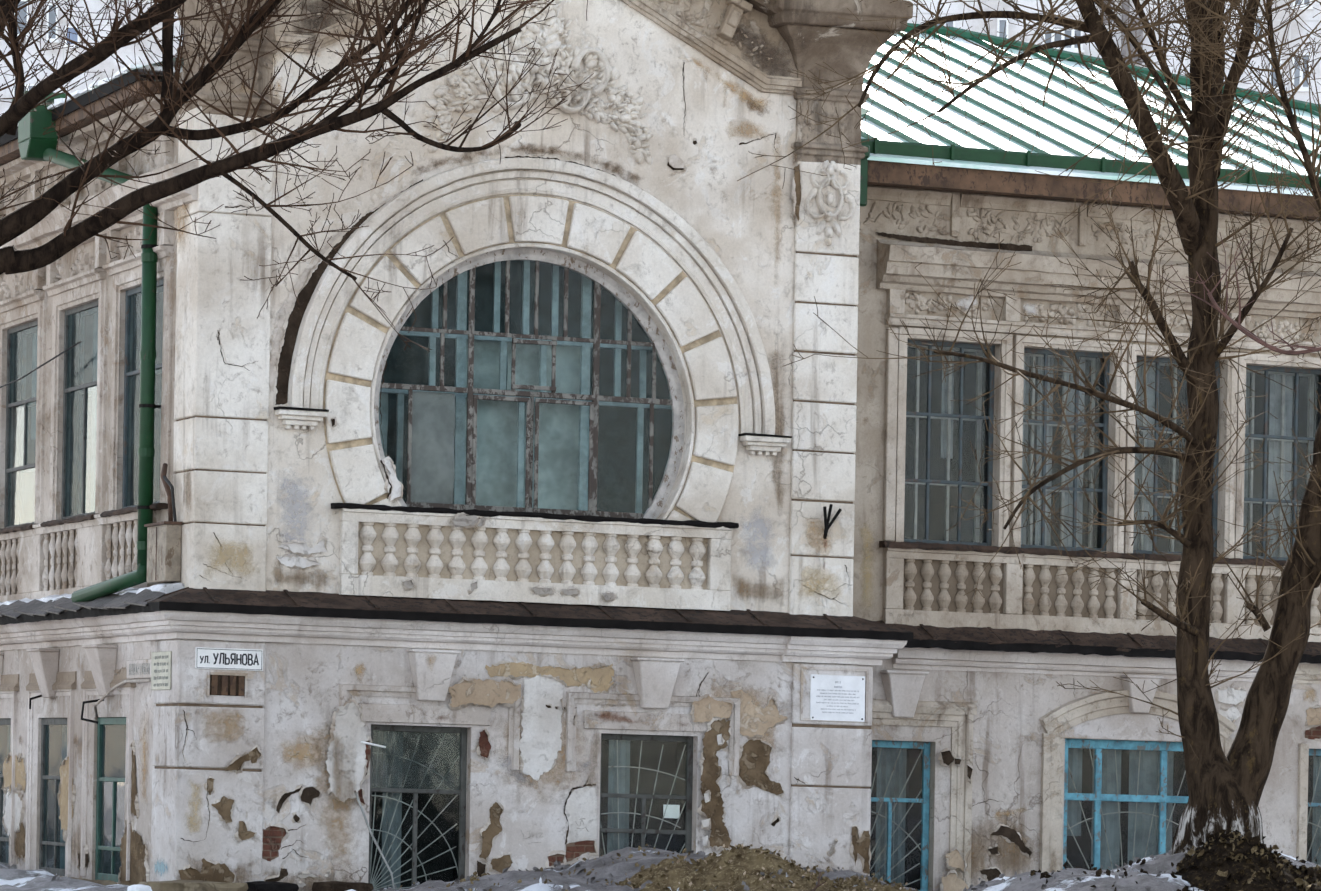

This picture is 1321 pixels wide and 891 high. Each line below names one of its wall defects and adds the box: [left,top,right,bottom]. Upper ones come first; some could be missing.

flaking render [277,536,328,570]
flaking render [448,661,629,781]
flaking render [1304,705,1321,742]
flaking render [1,751,27,864]
flaking render [57,756,76,842]
flaking render [117,739,150,885]
flaking render [204,699,372,891]
crack [564,777,596,844]
flaking render [690,686,788,850]
spalling [77,844,89,870]
flaking render [940,823,1032,891]